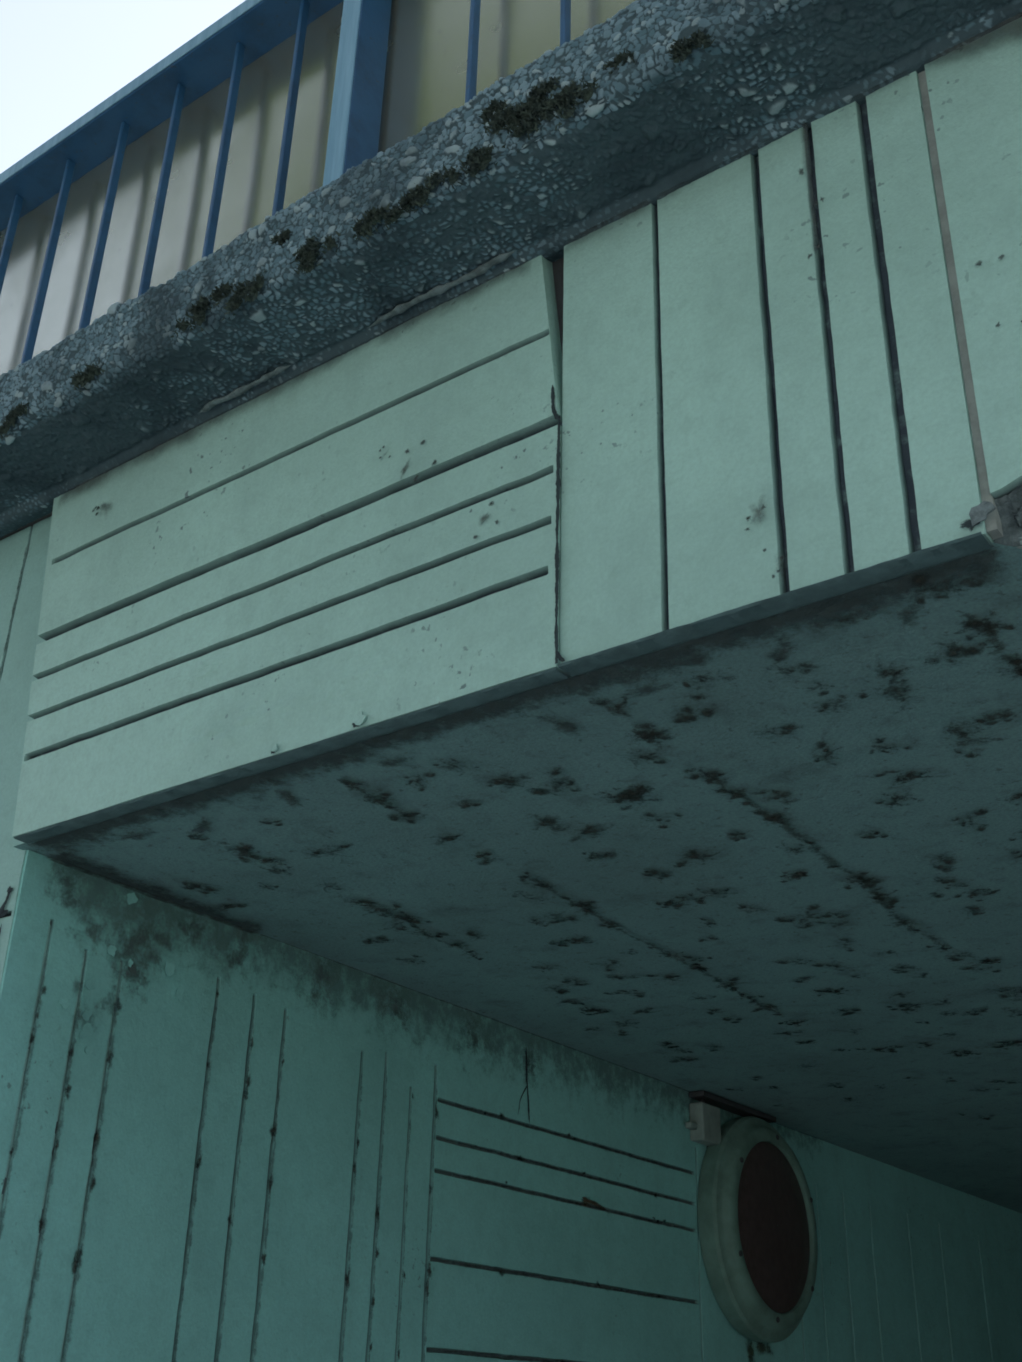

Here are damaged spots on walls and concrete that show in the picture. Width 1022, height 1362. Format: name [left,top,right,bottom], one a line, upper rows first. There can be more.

spalling [961,485,1022,549]
damp [28,549,1000,953]
damp [9,976,46,1166]
damp [54,1004,80,1158]
damp [72,1208,87,1280]
damp [90,998,121,1190]
damp [261,1095,279,1285]
damp [458,1142,672,1199]
damp [460,1105,673,1169]